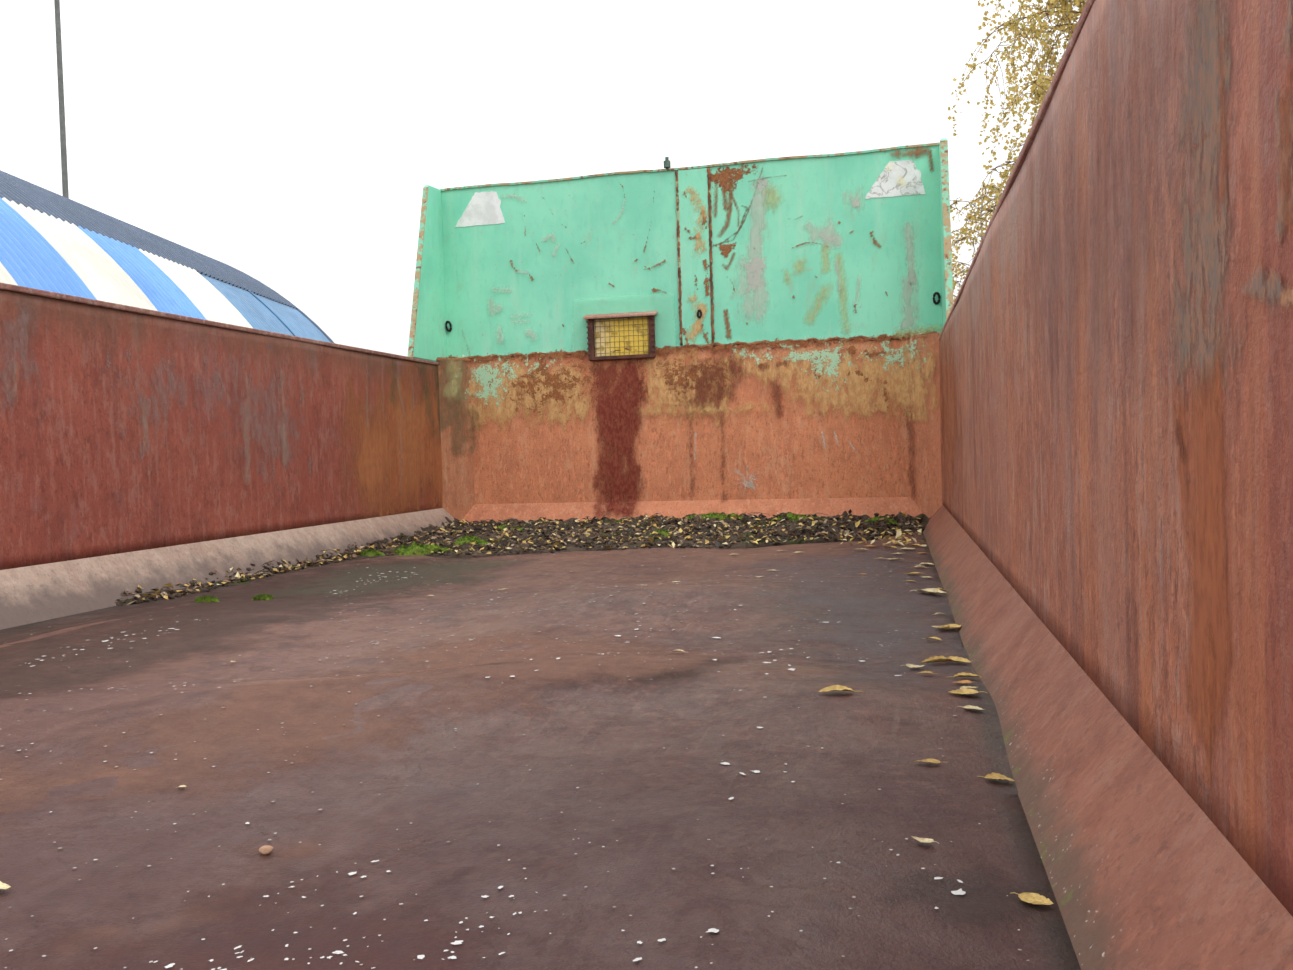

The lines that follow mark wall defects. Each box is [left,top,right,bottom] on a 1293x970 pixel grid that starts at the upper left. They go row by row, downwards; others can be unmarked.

peeling [455,352,598,430]
peeling [741,178,768,319]
peeling [641,223,936,424]
corrosion [655,162,939,501]